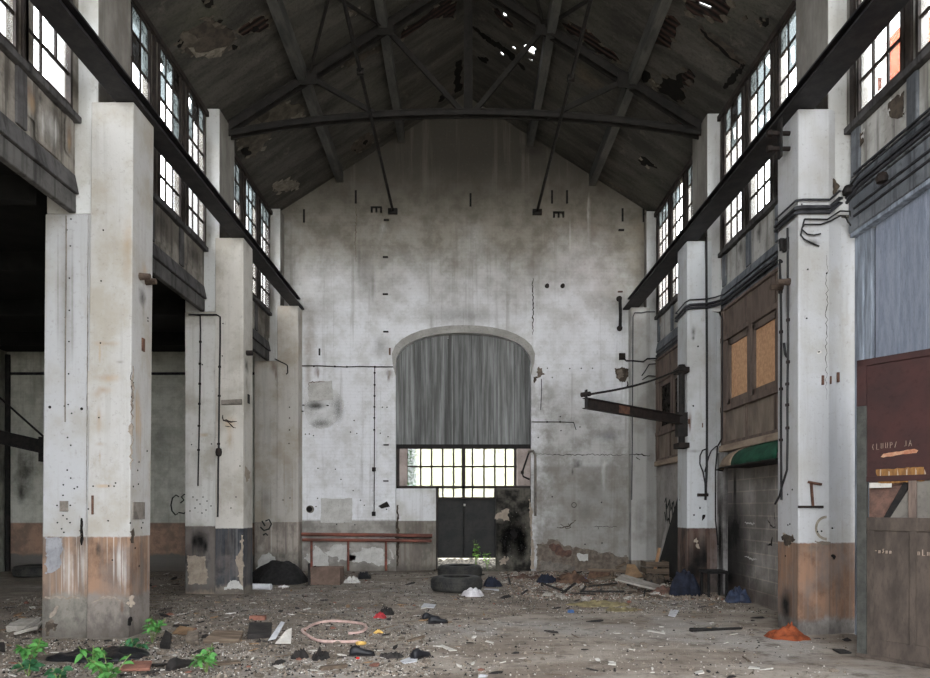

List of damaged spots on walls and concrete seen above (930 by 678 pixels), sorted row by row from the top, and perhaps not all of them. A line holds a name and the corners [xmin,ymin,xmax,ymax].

flaking render [492,8,515,30]
peeling [888,91,905,119]
peeling [272,177,300,195]
crack [529,279,537,335]
peeling [44,537,63,574]
peeling [187,555,209,585]
peeling [224,535,245,590]
water stain [501,520,526,557]
flaking render [529,499,628,571]